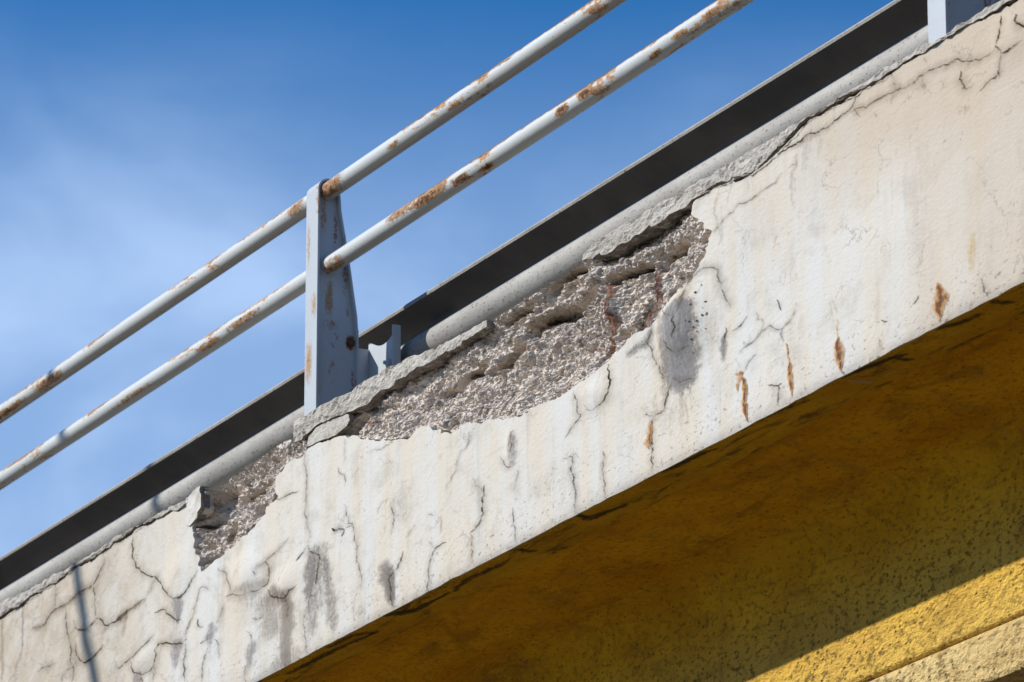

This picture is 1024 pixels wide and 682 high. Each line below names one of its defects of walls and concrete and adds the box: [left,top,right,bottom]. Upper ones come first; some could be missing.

corrosion [388,162,493,221]
crack [565,14,1024,513]
corrosion [0,399,23,419]
corrosion [196,308,259,352]
spalling [185,211,712,568]
leakage [630,296,700,394]
corrosion [735,371,747,421]
corrosion [785,343,793,396]
corrosion [833,326,844,373]
corrosion [933,282,948,321]
crack [1,392,375,682]
crack [348,502,445,605]